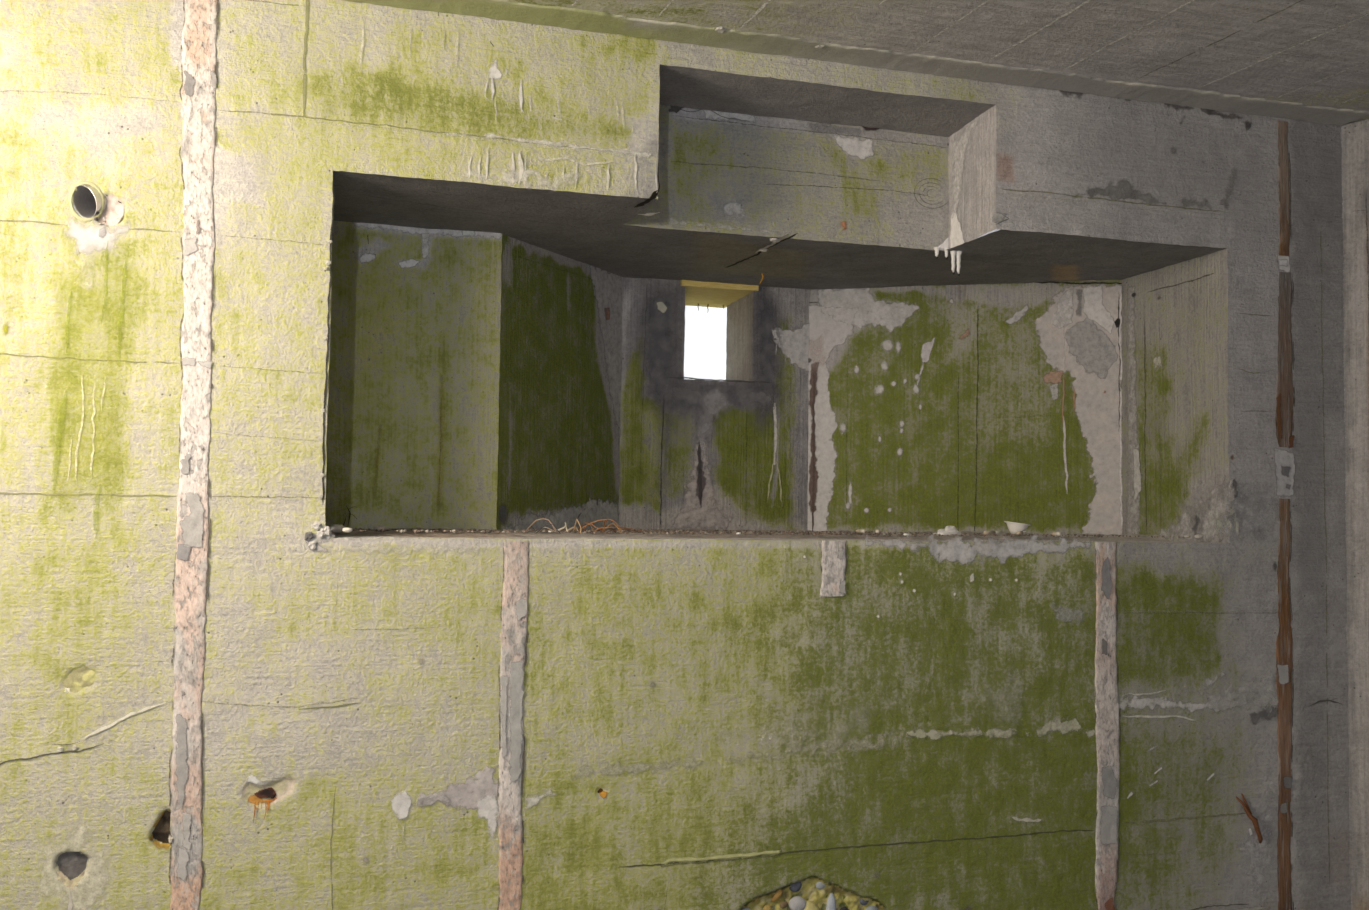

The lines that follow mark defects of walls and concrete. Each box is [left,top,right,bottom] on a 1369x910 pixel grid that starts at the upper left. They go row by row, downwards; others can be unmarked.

water stain [467,60,651,191]
spalling [94,194,124,227]
water stain [768,403,790,502]
peeling [865,284,1142,582]
water stain [1119,671,1278,724]
crack [0,703,165,765]
water stain [736,718,1095,763]
crack [624,859,714,867]
crack [750,830,1095,858]